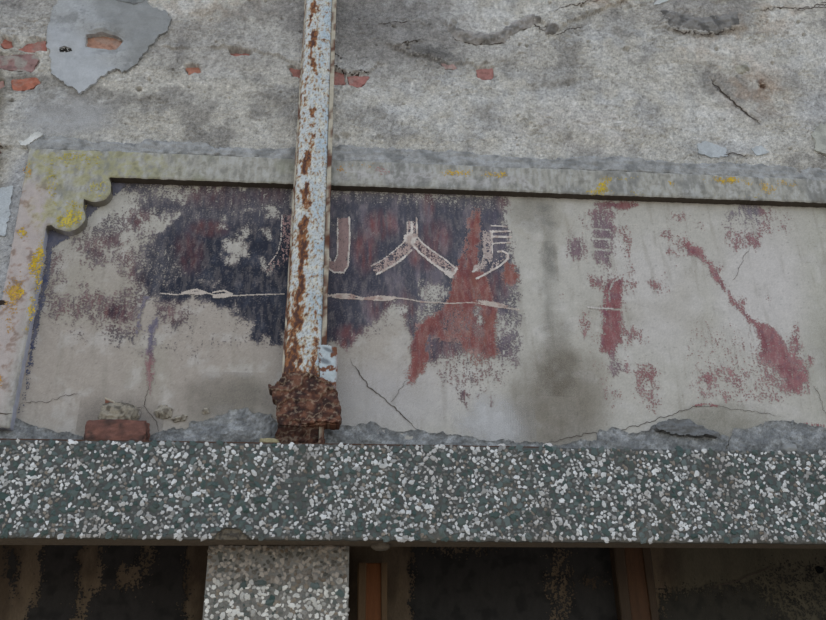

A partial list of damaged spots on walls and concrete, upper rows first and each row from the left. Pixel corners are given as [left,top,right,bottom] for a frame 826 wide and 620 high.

crack [523,0,596,34]
spalling [0,0,172,95]
flaking render [334,71,369,88]
crack [710,78,758,122]
peeling [18,132,44,149]
crack [351,362,419,431]
spalling [0,153,826,620]
crack [621,405,774,431]